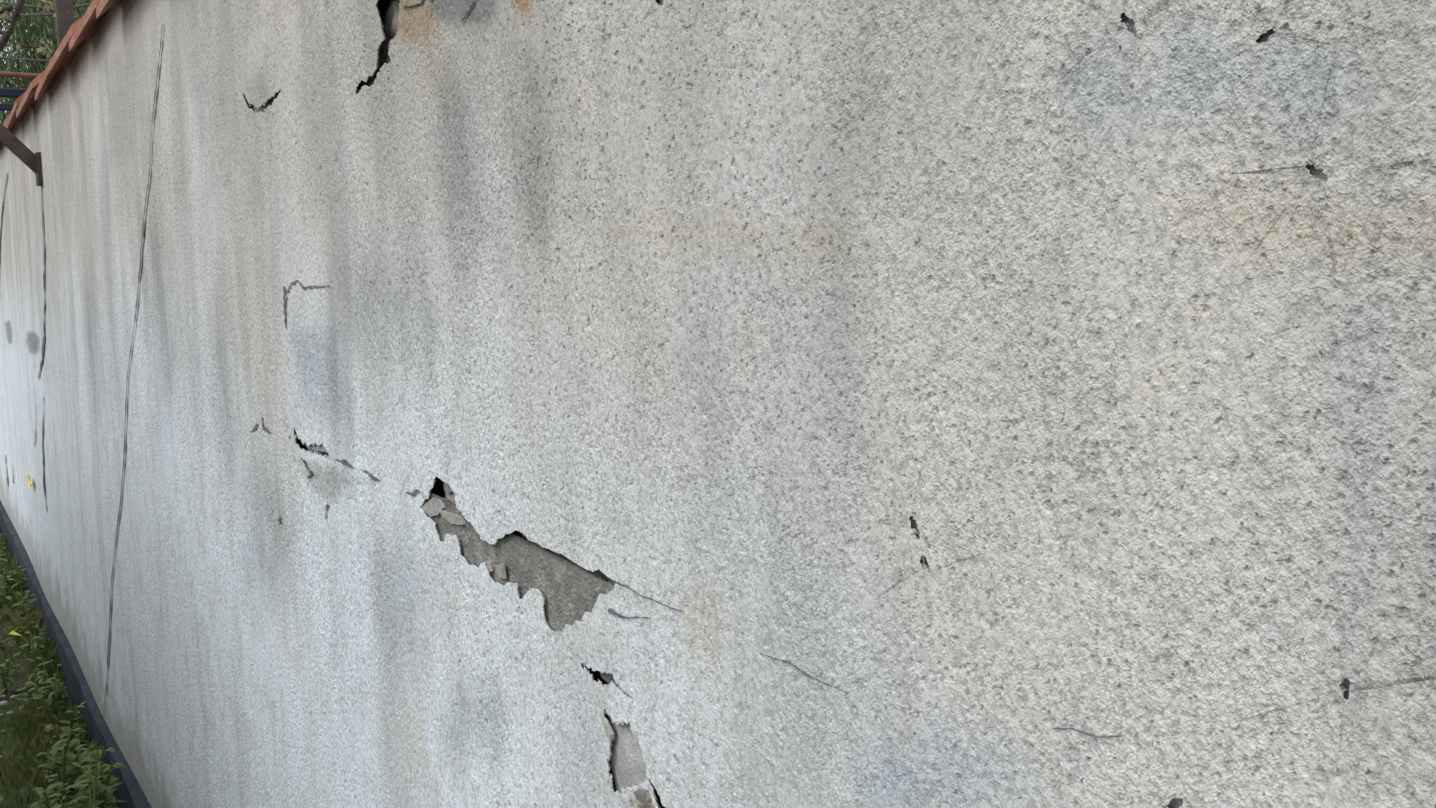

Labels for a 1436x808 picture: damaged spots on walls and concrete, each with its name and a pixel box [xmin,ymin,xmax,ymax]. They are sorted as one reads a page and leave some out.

crack [368,0,475,87]
crack [103,24,163,721]
crack [251,417,271,434]
crack [301,443,380,519]
flaking render [406,481,684,632]